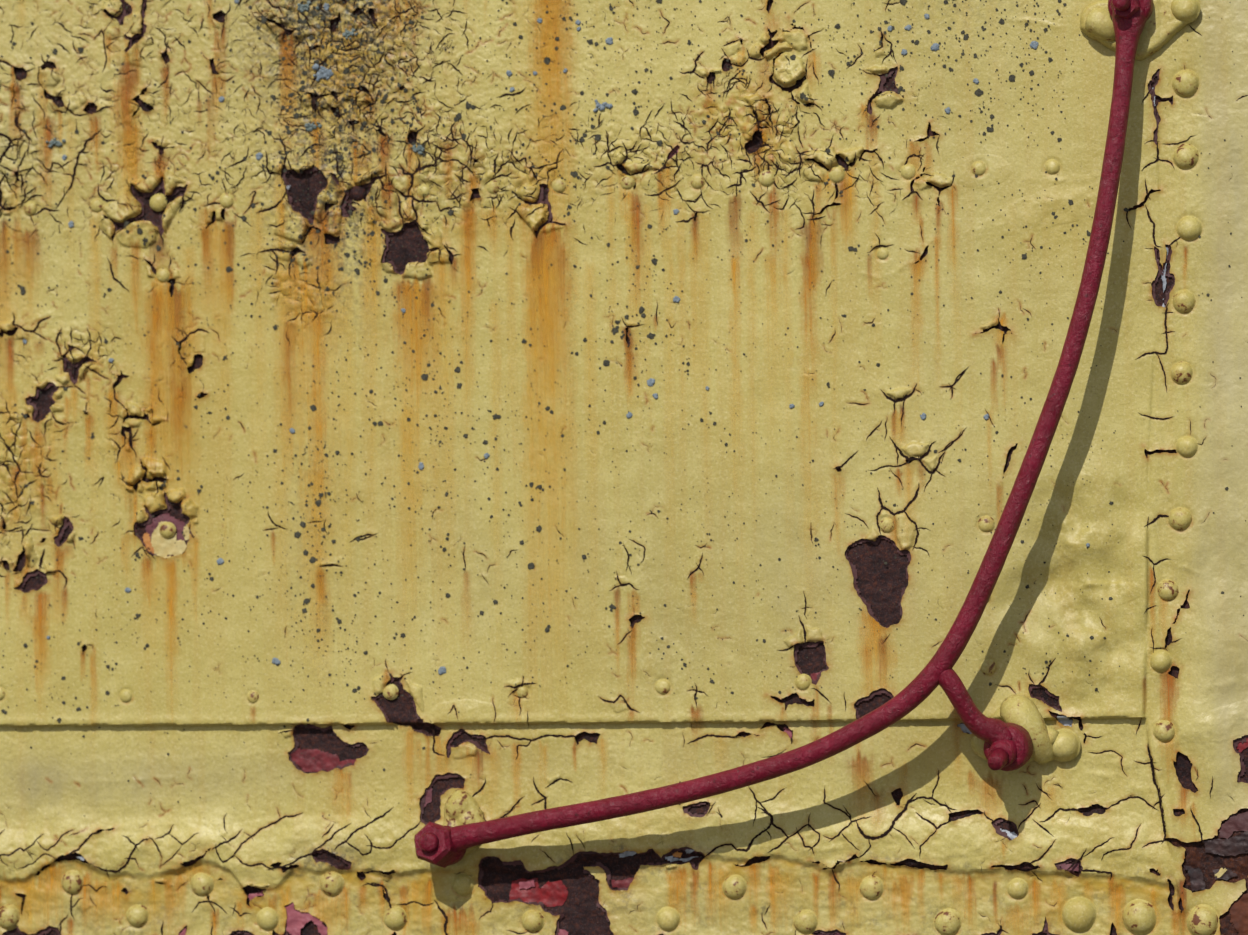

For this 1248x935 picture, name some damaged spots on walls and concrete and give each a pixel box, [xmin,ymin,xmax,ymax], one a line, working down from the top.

crack [1126,141,1174,228]
crack [0,0,956,583]
peeling [0,313,165,451]
crack [609,539,646,591]
peeling [845,484,930,644]
crack [0,769,448,935]
peeling [279,724,377,774]
peeling [371,660,490,825]
peeling [478,838,770,935]
crack [683,684,953,935]
crack [981,718,1235,906]
peeling [1165,808,1248,935]